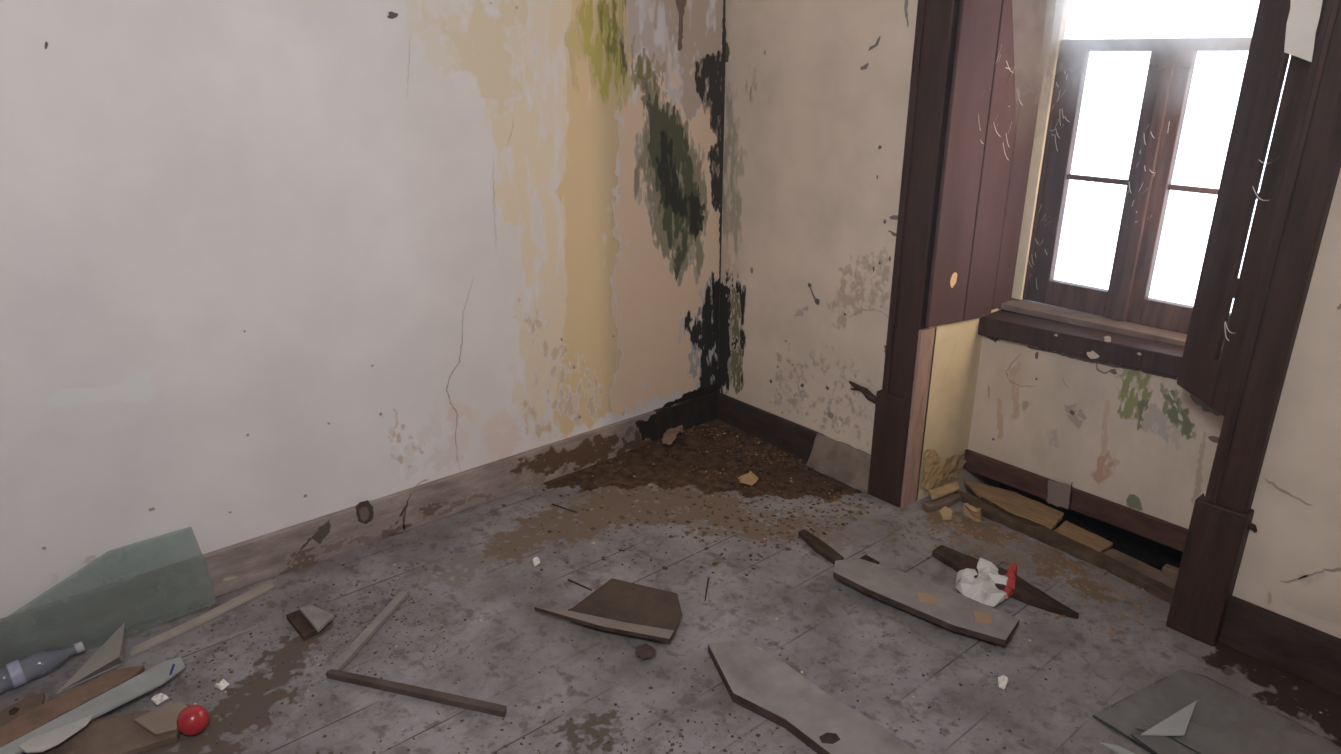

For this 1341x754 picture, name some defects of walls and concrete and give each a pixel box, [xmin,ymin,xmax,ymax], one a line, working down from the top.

water stain [380,0,764,482]
crack [446,279,473,471]
peeling [1087,336,1111,359]
crack [1282,568,1341,583]